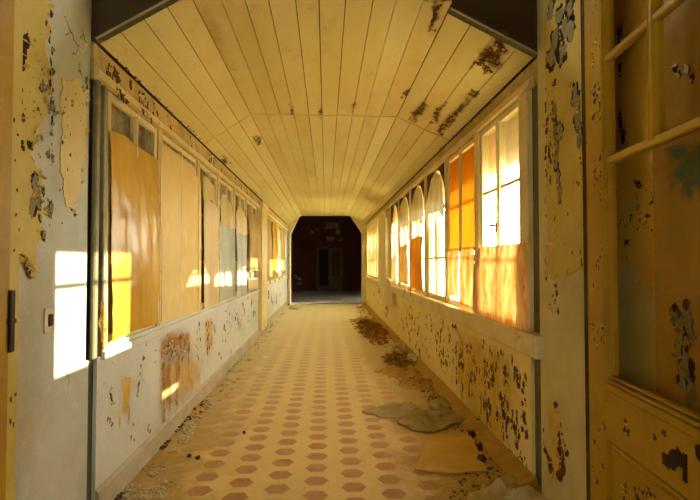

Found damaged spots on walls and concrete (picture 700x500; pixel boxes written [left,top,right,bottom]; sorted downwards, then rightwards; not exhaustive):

peeling [13,0,92,279]
peeling [106,59,236,180]
peeling [476,41,506,73]
peeling [542,0,602,314]
peeling [670,63,695,83]
rust [157,327,191,426]
peeling [397,303,528,467]
peeling [669,298,697,408]